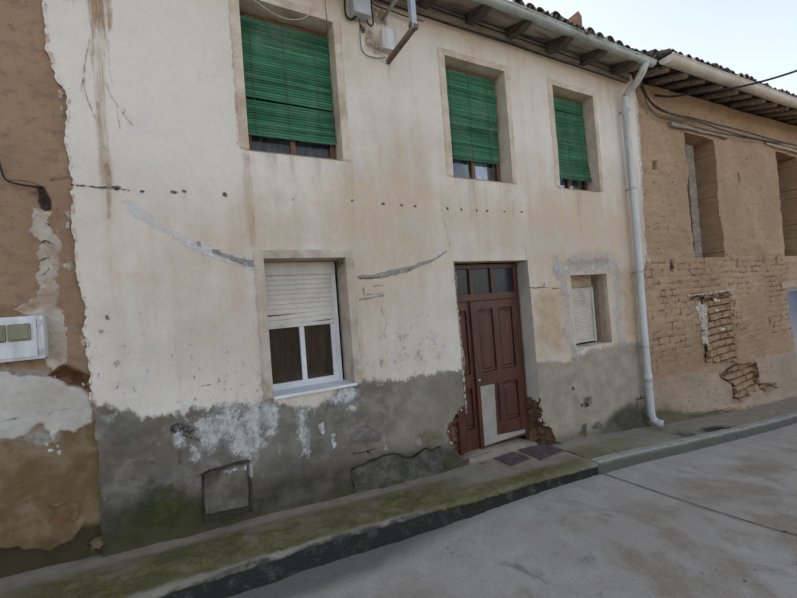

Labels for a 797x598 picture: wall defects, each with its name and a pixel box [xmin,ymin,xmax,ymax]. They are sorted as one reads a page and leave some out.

crack [71,184,254,269]
peeling [0,204,94,455]
peeling [173,399,279,477]
peeling [297,407,337,455]
flaking render [352,268,467,493]
flaking render [527,395,558,446]
flaking render [688,288,780,401]
peeling [0,492,88,551]